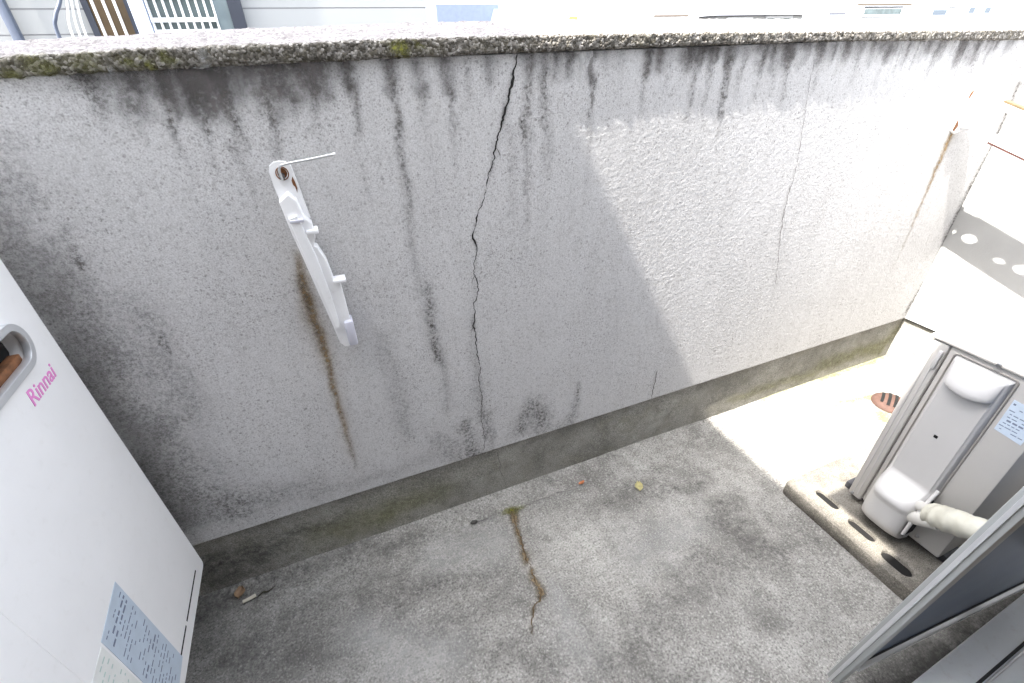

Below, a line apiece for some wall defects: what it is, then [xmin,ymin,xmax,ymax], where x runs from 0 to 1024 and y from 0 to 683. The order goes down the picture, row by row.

leakage [107,61,360,135]
leakage [384,58,409,190]
leakage [520,51,596,146]
leakage [645,48,664,75]
leakage [687,46,734,116]
leakage [763,43,796,68]
leakage [957,40,982,61]
corrosion [299,272,347,437]
crack [471,55,572,633]